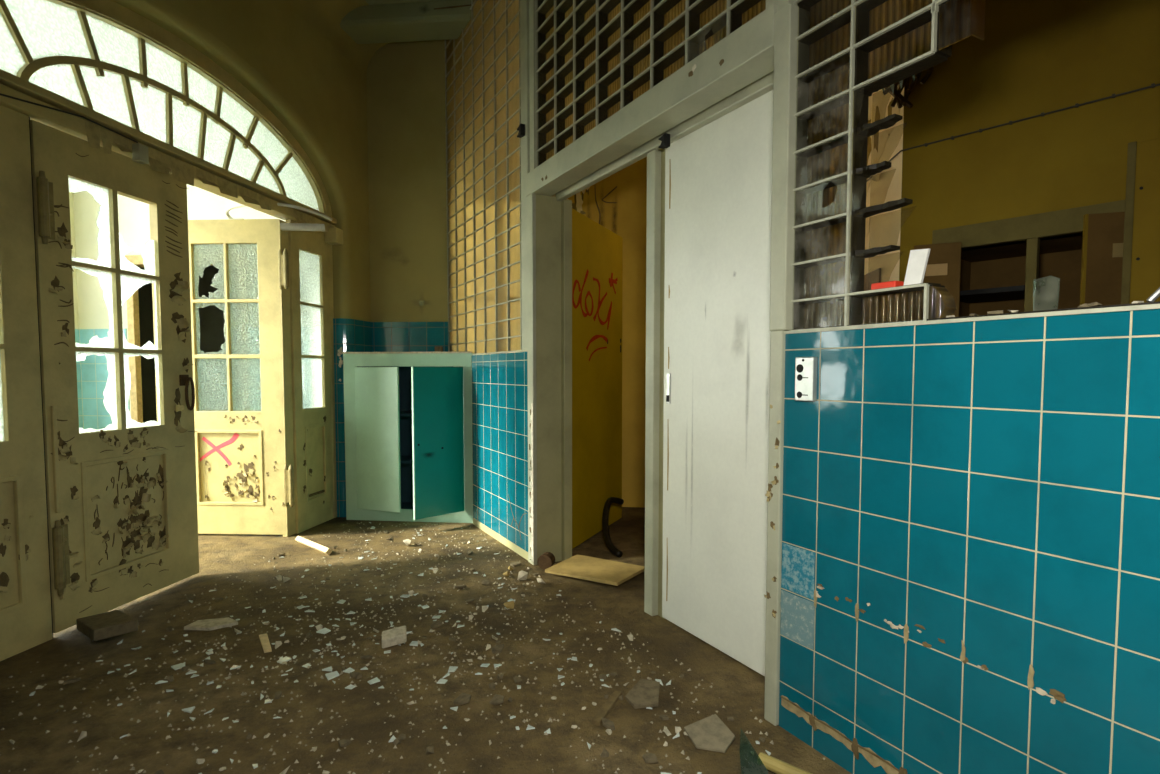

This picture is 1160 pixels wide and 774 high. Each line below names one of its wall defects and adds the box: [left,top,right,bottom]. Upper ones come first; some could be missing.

peeling [765,463,779,502]
spalling [764,543,815,649]
peeling [781,695,908,774]